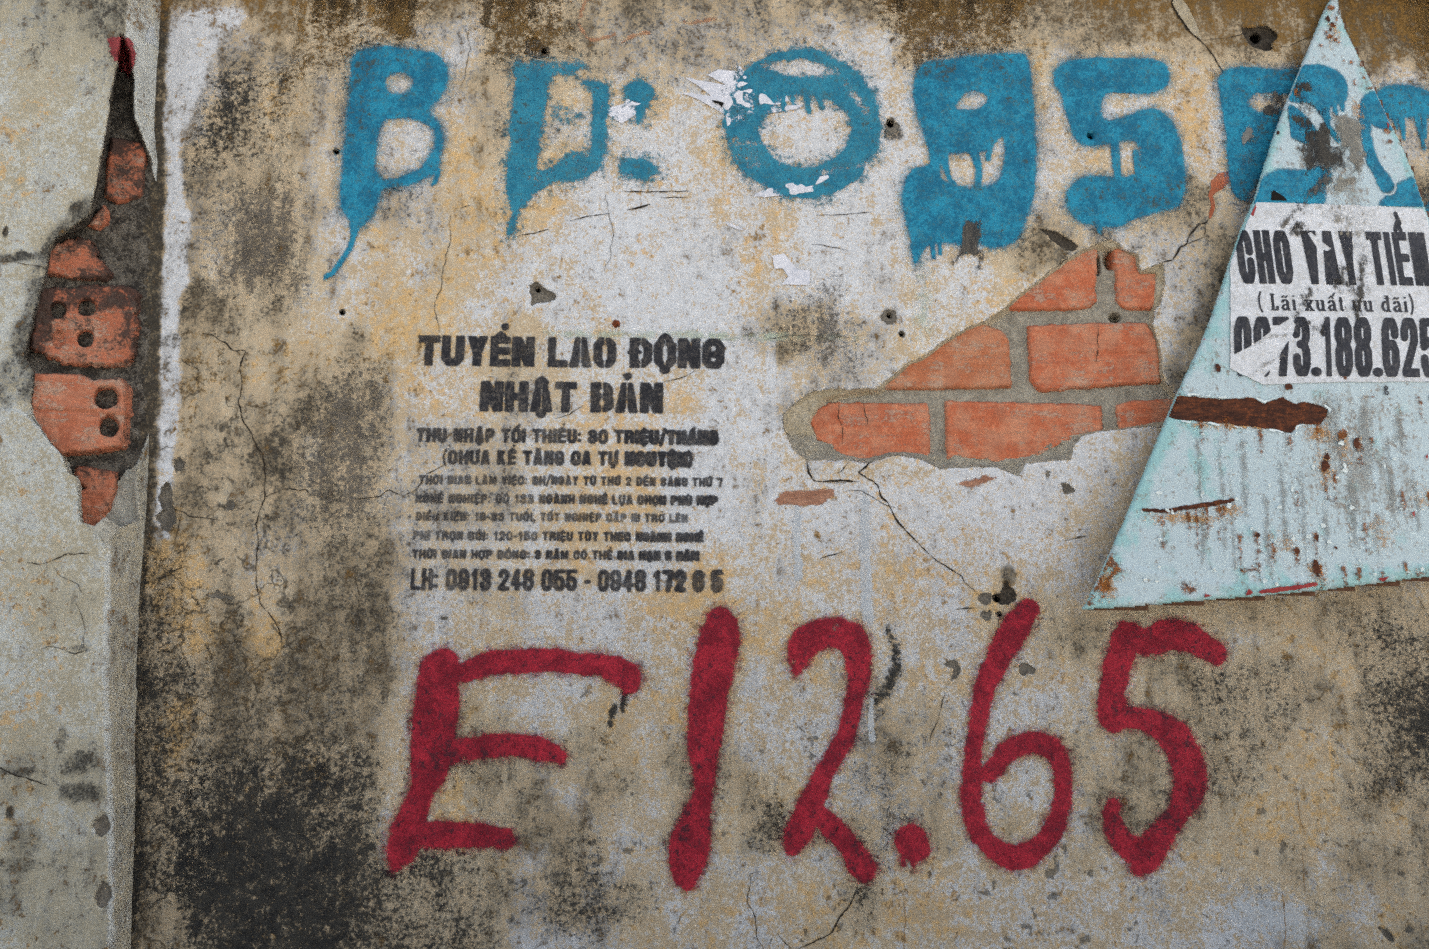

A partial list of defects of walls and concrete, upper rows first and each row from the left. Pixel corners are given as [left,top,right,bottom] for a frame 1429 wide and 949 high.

leakage [184,0,430,169]
leakage [472,0,576,70]
leakage [877,0,1030,68]
crack [1172,0,1243,72]
spalling [25,38,156,548]
spalling [783,228,1176,494]
spalling [156,457,186,531]
crack [163,509,216,574]
crack [182,333,313,648]
crack [807,462,975,591]
leakage [131,549,503,949]
leakage [1337,606,1429,806]